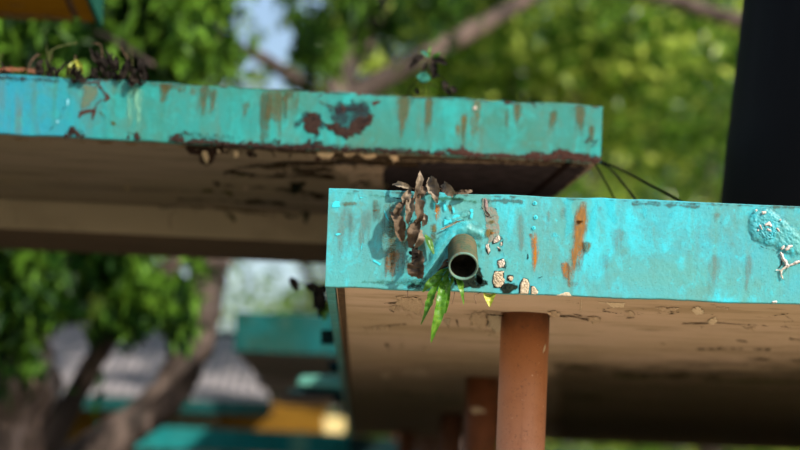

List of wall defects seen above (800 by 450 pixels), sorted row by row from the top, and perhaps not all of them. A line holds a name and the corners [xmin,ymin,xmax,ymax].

rust [168,90,601,164]
spalling [185,145,589,190]
peeling [433,198,541,295]
rust [561,206,590,287]